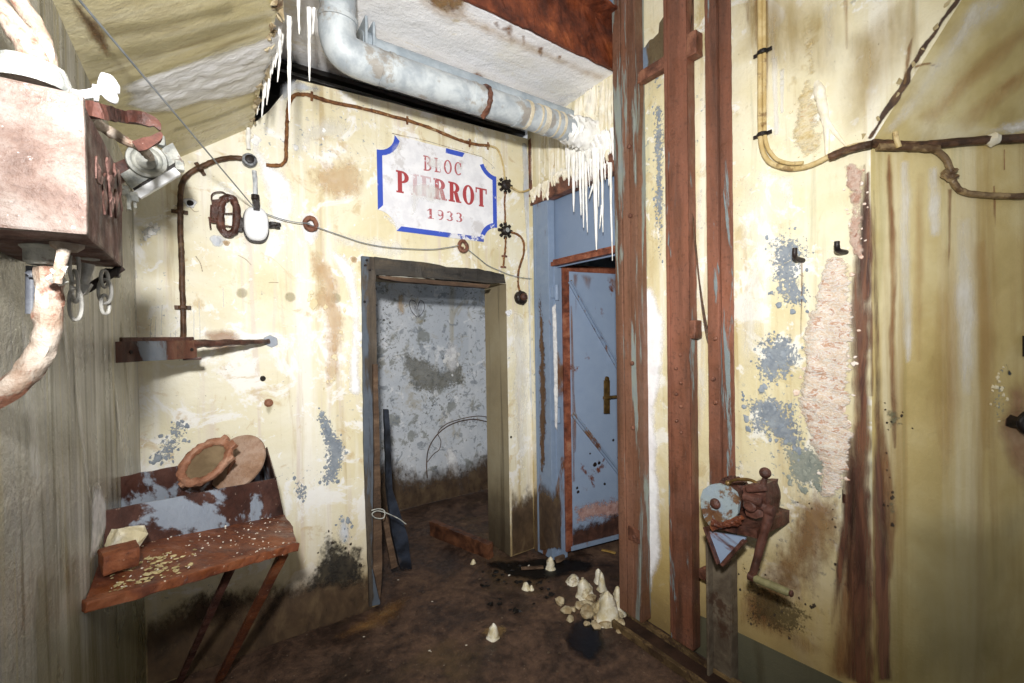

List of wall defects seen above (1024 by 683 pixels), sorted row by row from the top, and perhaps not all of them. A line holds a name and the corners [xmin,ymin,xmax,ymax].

spalling [789,42,821,158]
peeling [652,106,664,263]
peeling [149,420,190,466]
peeling [293,407,348,503]
damp [380,448,488,516]
rust [538,298,546,472]
rust [573,501,619,545]
spalling [741,164,869,497]
rust [836,161,896,683]
damp [147,530,372,683]